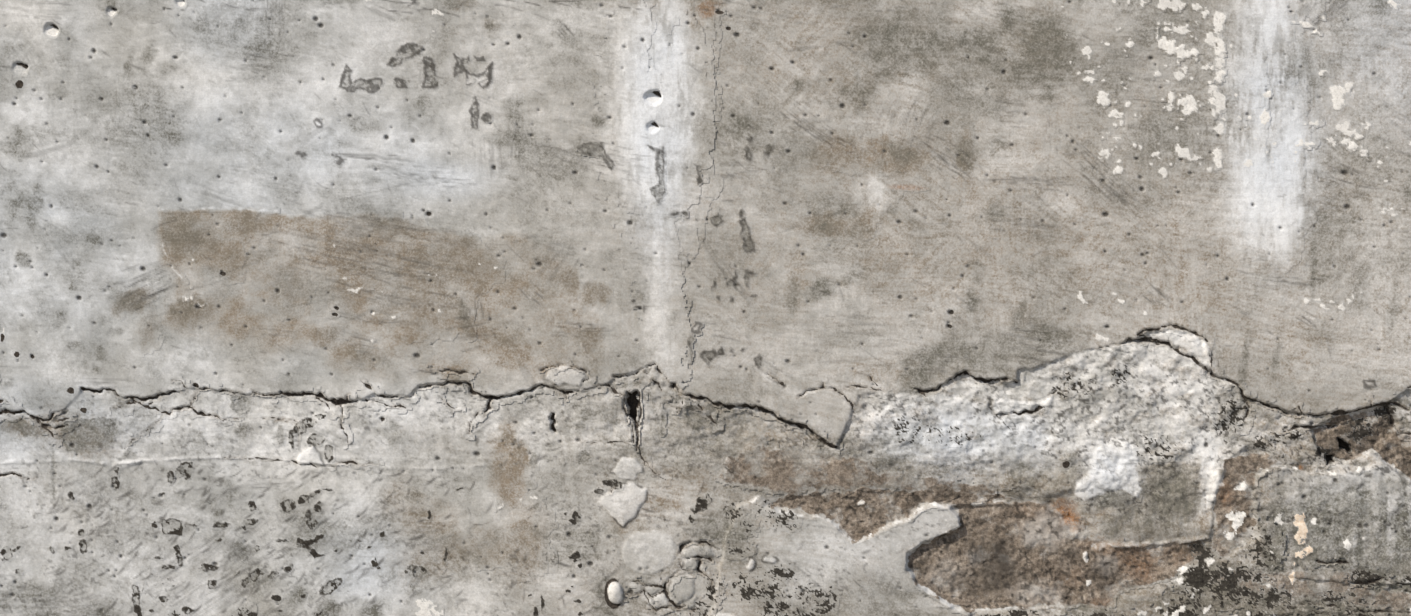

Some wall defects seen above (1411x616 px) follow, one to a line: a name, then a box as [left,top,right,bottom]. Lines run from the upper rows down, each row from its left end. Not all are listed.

damp [106,0,724,452]
damp [1188,0,1342,351]
damp [472,409,558,582]
crack [0,357,1079,495]
peeling [575,405,594,431]
peeling [576,448,625,496]
peeling [684,389,720,434]
spalling [662,417,1411,616]
crack [1098,319,1411,441]
peeling [1361,378,1381,403]